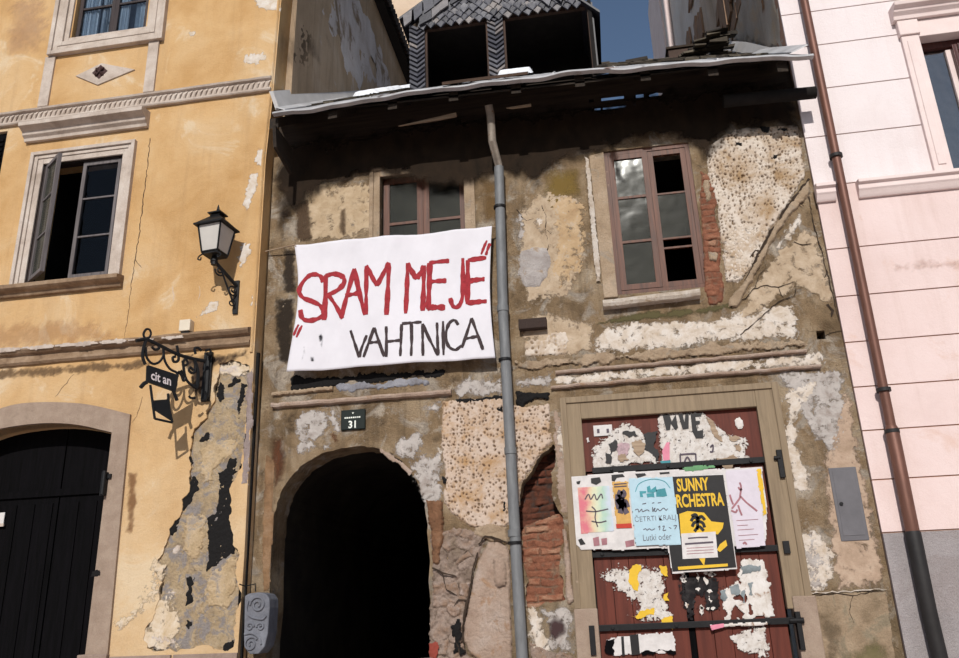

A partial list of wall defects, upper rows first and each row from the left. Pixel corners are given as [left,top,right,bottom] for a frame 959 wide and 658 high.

peeling [256,0,281,11]
flaking render [322,0,391,90]
flaking render [702,0,783,47]
peeling [242,149,266,209]
crack [125,140,151,332]
flaking render [114,361,254,652]
peeling [262,455,275,591]
peeling [328,408,341,434]
peeling [380,432,423,476]
flaking render [519,425,564,532]
peeling [782,381,817,492]
peeling [802,530,837,591]